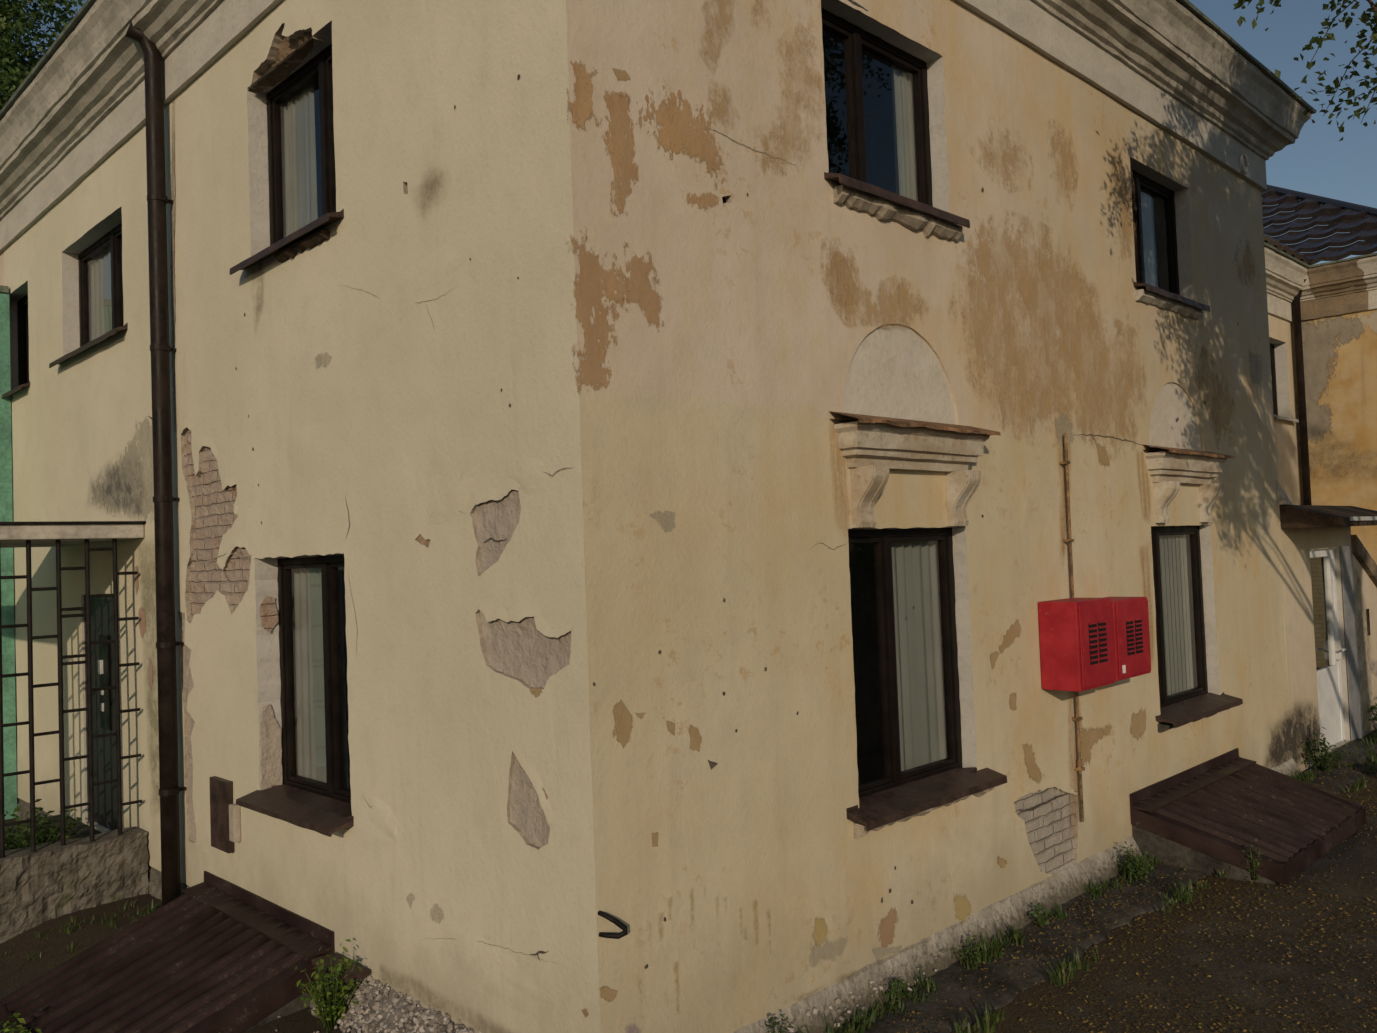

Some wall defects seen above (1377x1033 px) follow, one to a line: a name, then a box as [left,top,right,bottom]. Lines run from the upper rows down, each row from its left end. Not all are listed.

flaking render [248,23,325,93]
peeling [566,60,732,218]
peeling [567,230,664,393]
flaking render [1297,311,1377,472]
flaking render [468,467,521,576]
flaking render [178,419,253,843]
flaking render [471,599,574,697]
flaking render [261,704,283,790]
flaking render [507,740,554,850]
flaking render [1011,743,1080,873]
leakage [1270,708,1320,766]
crack [423,938,565,967]